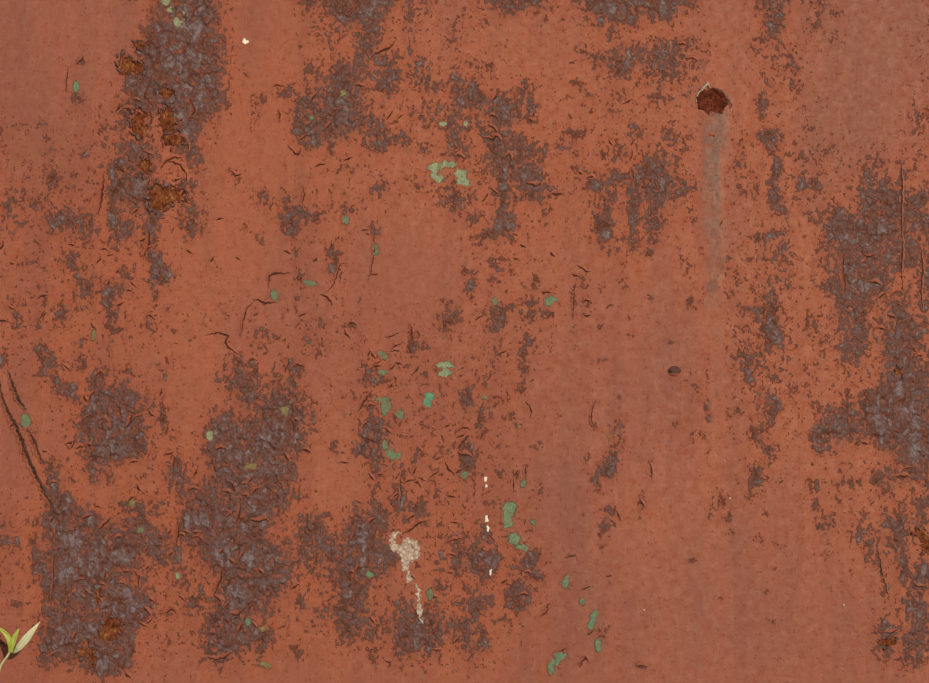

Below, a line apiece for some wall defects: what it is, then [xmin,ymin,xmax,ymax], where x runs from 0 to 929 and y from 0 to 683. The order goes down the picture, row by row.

peeling [159,0,185,30]
peeling [426,159,472,188]